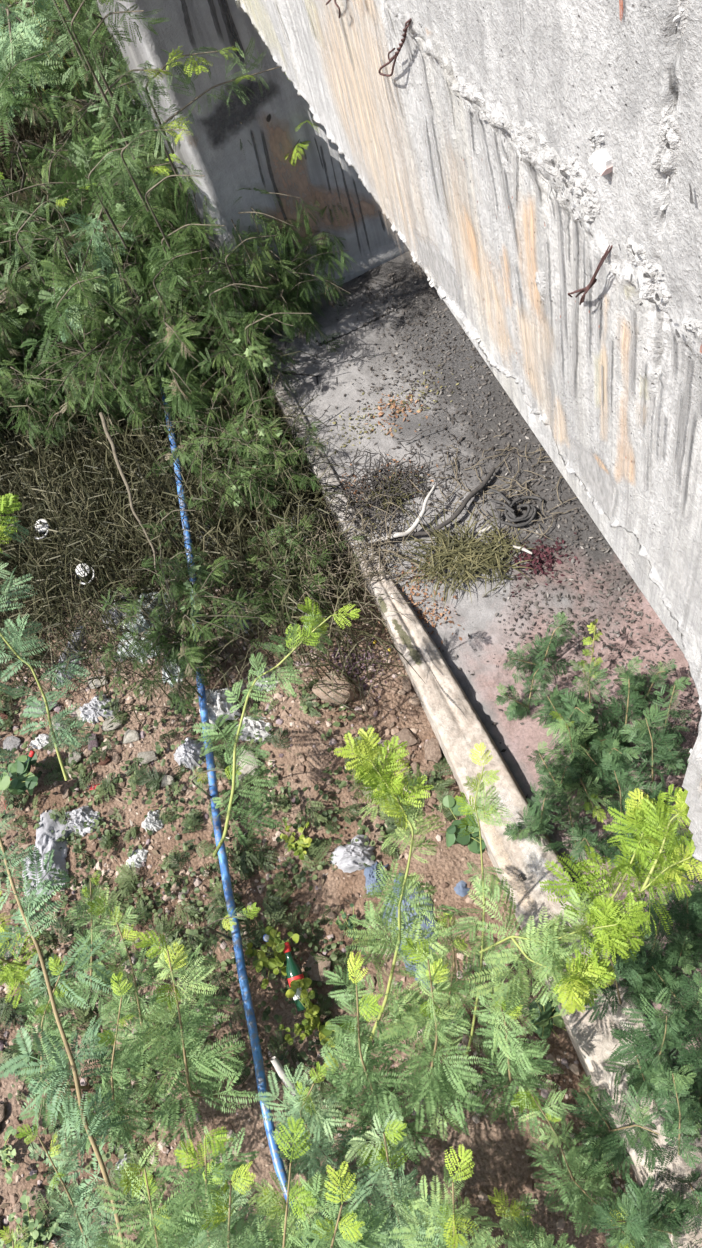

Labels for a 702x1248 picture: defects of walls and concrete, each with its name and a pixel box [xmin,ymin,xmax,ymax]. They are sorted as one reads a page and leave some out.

corrosion [326,10,410,221]
crack [651,0,694,220]